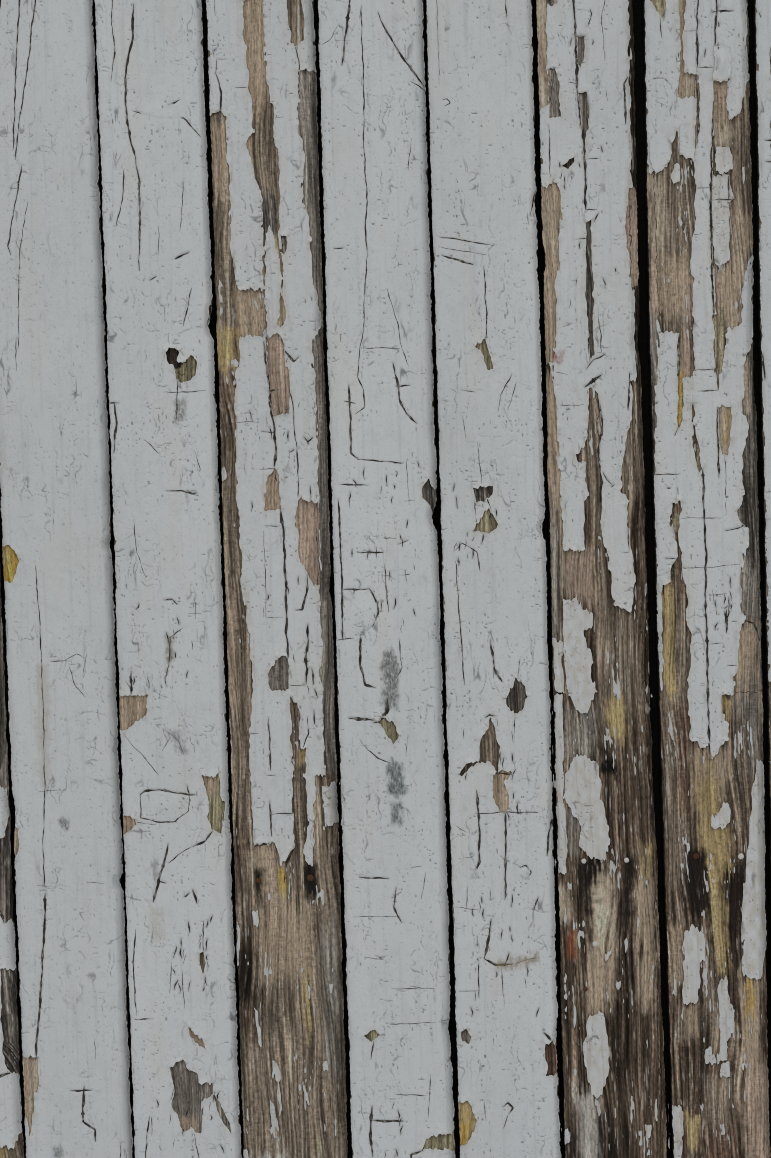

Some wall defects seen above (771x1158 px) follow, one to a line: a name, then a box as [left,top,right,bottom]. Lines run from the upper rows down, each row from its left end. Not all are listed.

crack [111,0,188,280]
crack [173,61,246,136]
peeling [536,0,561,118]
crack [279,0,450,763]
peeling [166,0,348,1158]
crack [235,342,318,747]
peeling [540,0,771,1158]
peeling [460,718,512,812]
peeling [506,678,527,714]
crack [360,866,426,923]
peeling [0,966,39,1158]
crack [72,1087,224,1158]